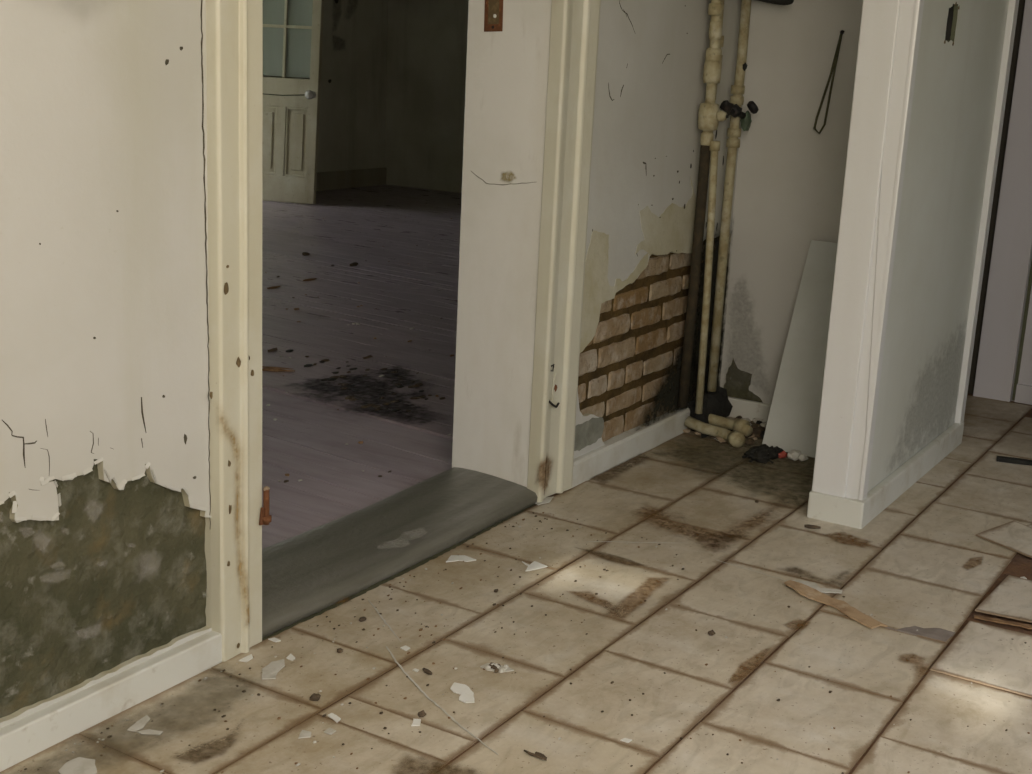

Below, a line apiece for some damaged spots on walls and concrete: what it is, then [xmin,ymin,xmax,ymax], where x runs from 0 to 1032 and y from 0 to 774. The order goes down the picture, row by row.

flaking render [578,171,720,442]
crack [2,419,50,491]
crack [139,397,147,448]
flaking render [0,457,211,718]
flaking render [127,715,163,736]